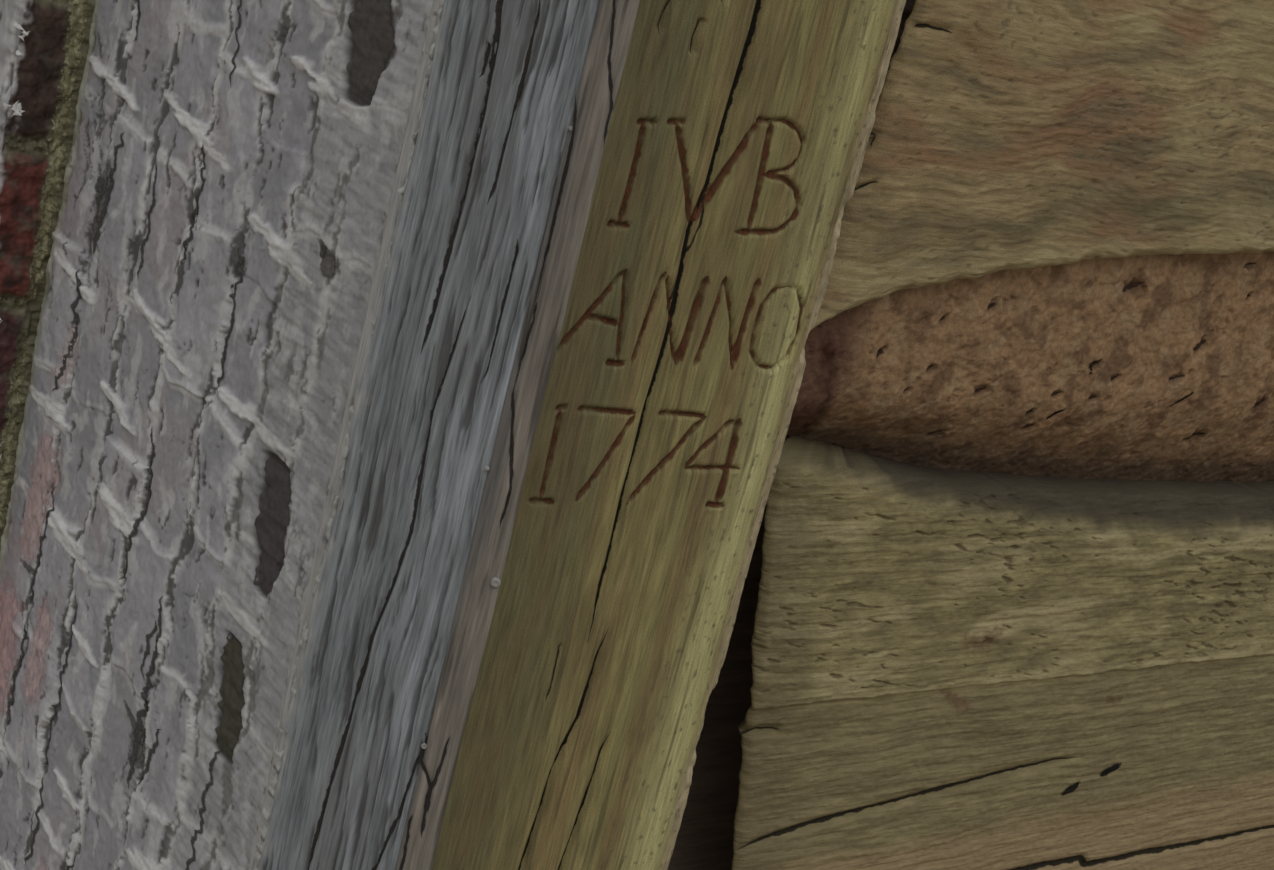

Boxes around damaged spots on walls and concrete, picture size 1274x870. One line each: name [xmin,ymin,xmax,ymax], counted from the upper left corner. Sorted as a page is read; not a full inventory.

crack [518,0,761,870]
crack [735,755,1086,850]
crack [1010,825,1274,870]